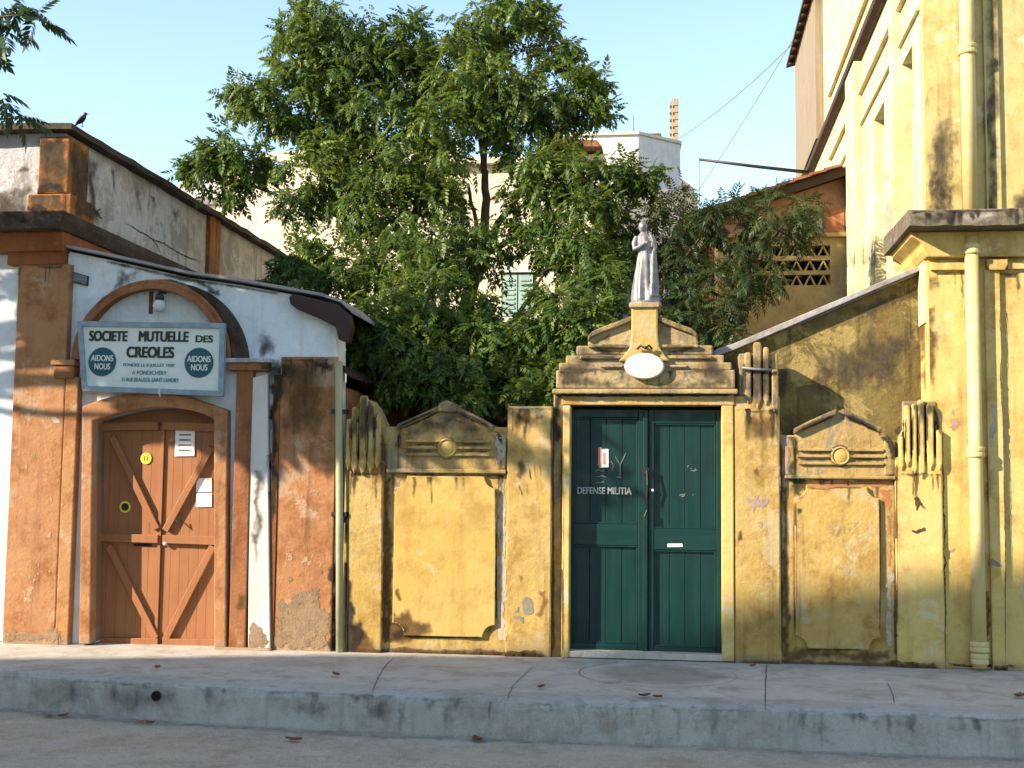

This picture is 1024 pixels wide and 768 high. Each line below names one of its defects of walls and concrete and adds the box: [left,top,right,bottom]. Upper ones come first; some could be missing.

damp [983,0,999,158]
damp [913,129,1024,224]
crack [128,224,199,262]
damp [818,338,904,387]
peeling [495,434,507,463]
peeling [497,476,533,641]
damp [328,344,729,657]
damp [742,359,941,669]
spalling [248,577,330,650]